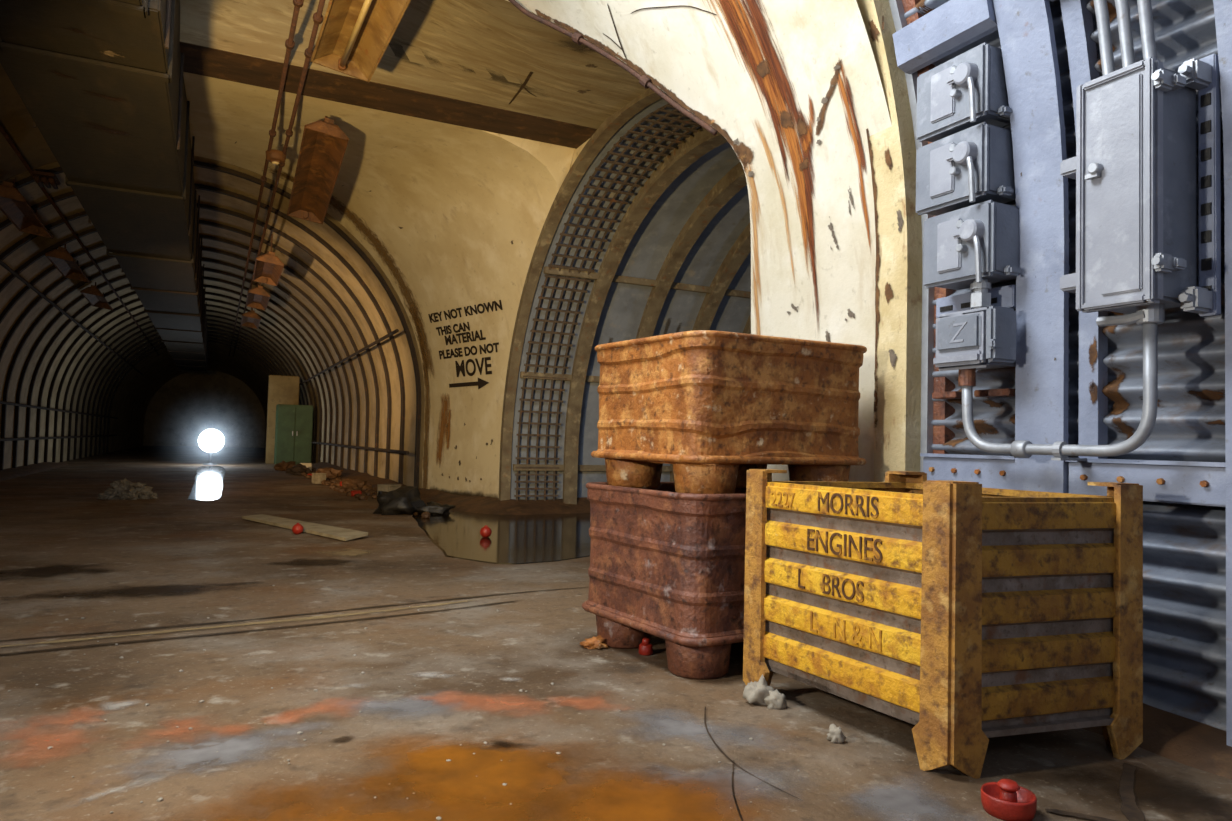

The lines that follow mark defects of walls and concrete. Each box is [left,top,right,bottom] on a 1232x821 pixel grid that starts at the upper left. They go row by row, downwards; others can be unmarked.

rust [1090,0,1117,22]
rust [708,0,819,335]
rust [835,60,870,247]
rust [1089,311,1143,440]
rust [1187,389,1225,401]